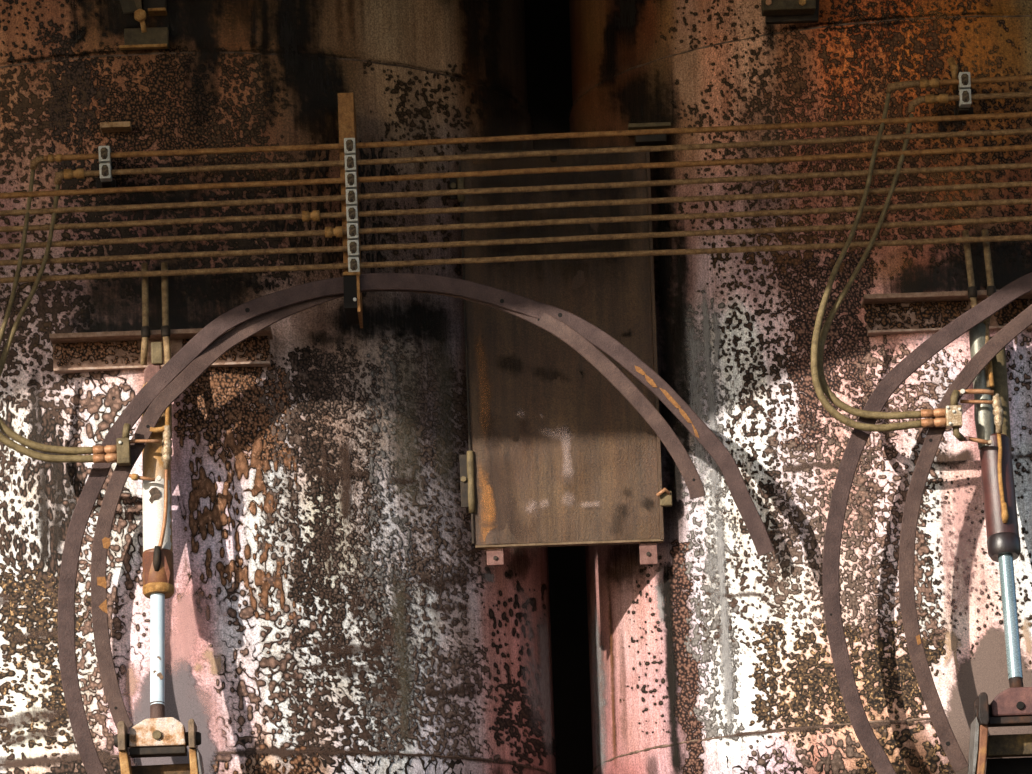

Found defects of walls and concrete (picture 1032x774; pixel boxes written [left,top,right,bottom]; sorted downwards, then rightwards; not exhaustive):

water stain [69,0,347,144]
water stain [600,0,679,128]
peeling [58,370,135,513]
peeling [106,487,150,733]
rust [0,0,343,774]
peeling [132,354,501,774]
rust [211,332,560,774]
rust [599,0,1032,774]